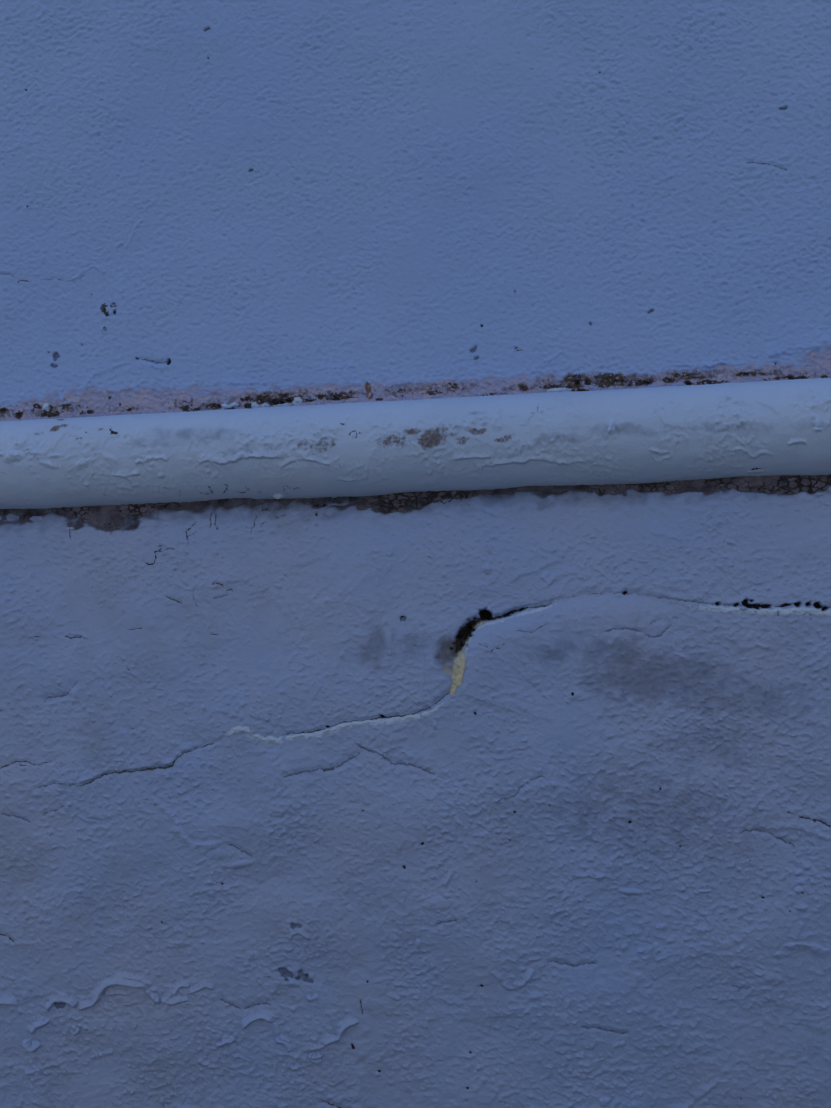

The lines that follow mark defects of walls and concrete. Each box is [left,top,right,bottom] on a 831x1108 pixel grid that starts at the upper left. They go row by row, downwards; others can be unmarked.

crack [455,591,830,657]
crack [281,692,450,779]